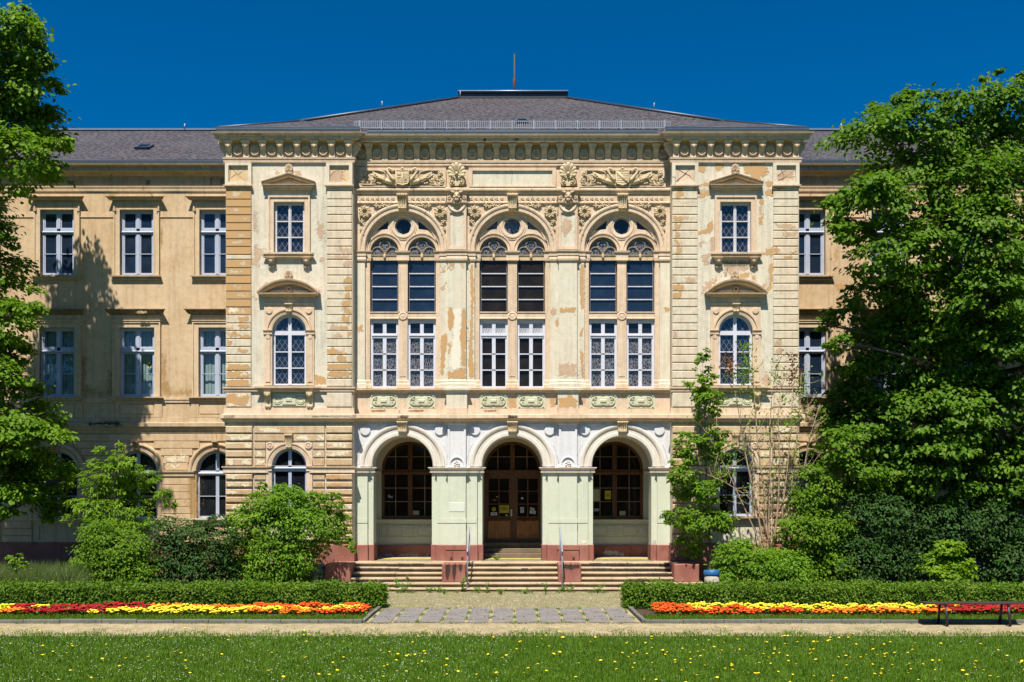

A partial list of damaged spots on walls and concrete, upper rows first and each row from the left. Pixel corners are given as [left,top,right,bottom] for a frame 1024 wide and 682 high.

peeling [674,163,727,198]
peeling [743,163,783,225]
peeling [698,220,715,266]
peeling [740,223,797,291]
peeling [226,187,267,407]
peeling [315,247,364,385]
peeling [438,262,476,379]
peeling [551,264,585,326]
peeling [555,350,585,378]
peeling [226,426,284,517]
peeling [297,435,351,457]
peeling [315,475,352,509]